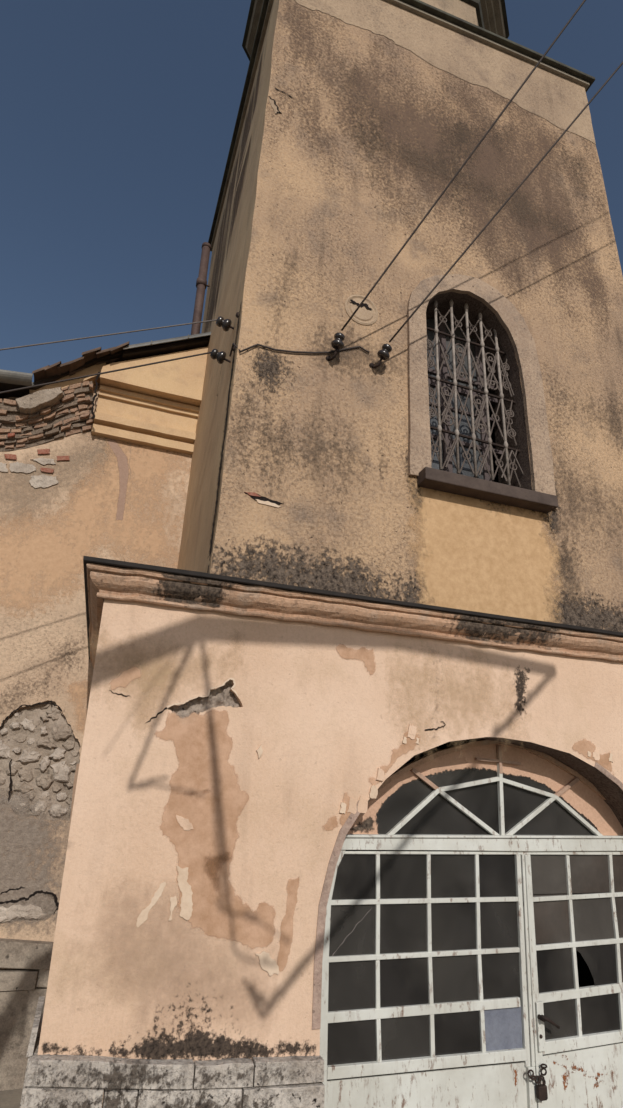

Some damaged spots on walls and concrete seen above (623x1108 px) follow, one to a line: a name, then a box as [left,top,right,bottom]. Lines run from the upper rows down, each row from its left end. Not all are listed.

damp [279,2,608,322]
flaking render [0,438,129,520]
spalling [244,492,283,508]
damp [559,551,577,606]
peeling [336,644,375,675]
damp [514,667,530,713]
flaking render [0,700,81,821]
peeling [323,724,420,830]
peeling [572,739,613,771]
peeling [146,678,299,976]
flaking render [0,890,59,924]
damp [146,983,211,1045]